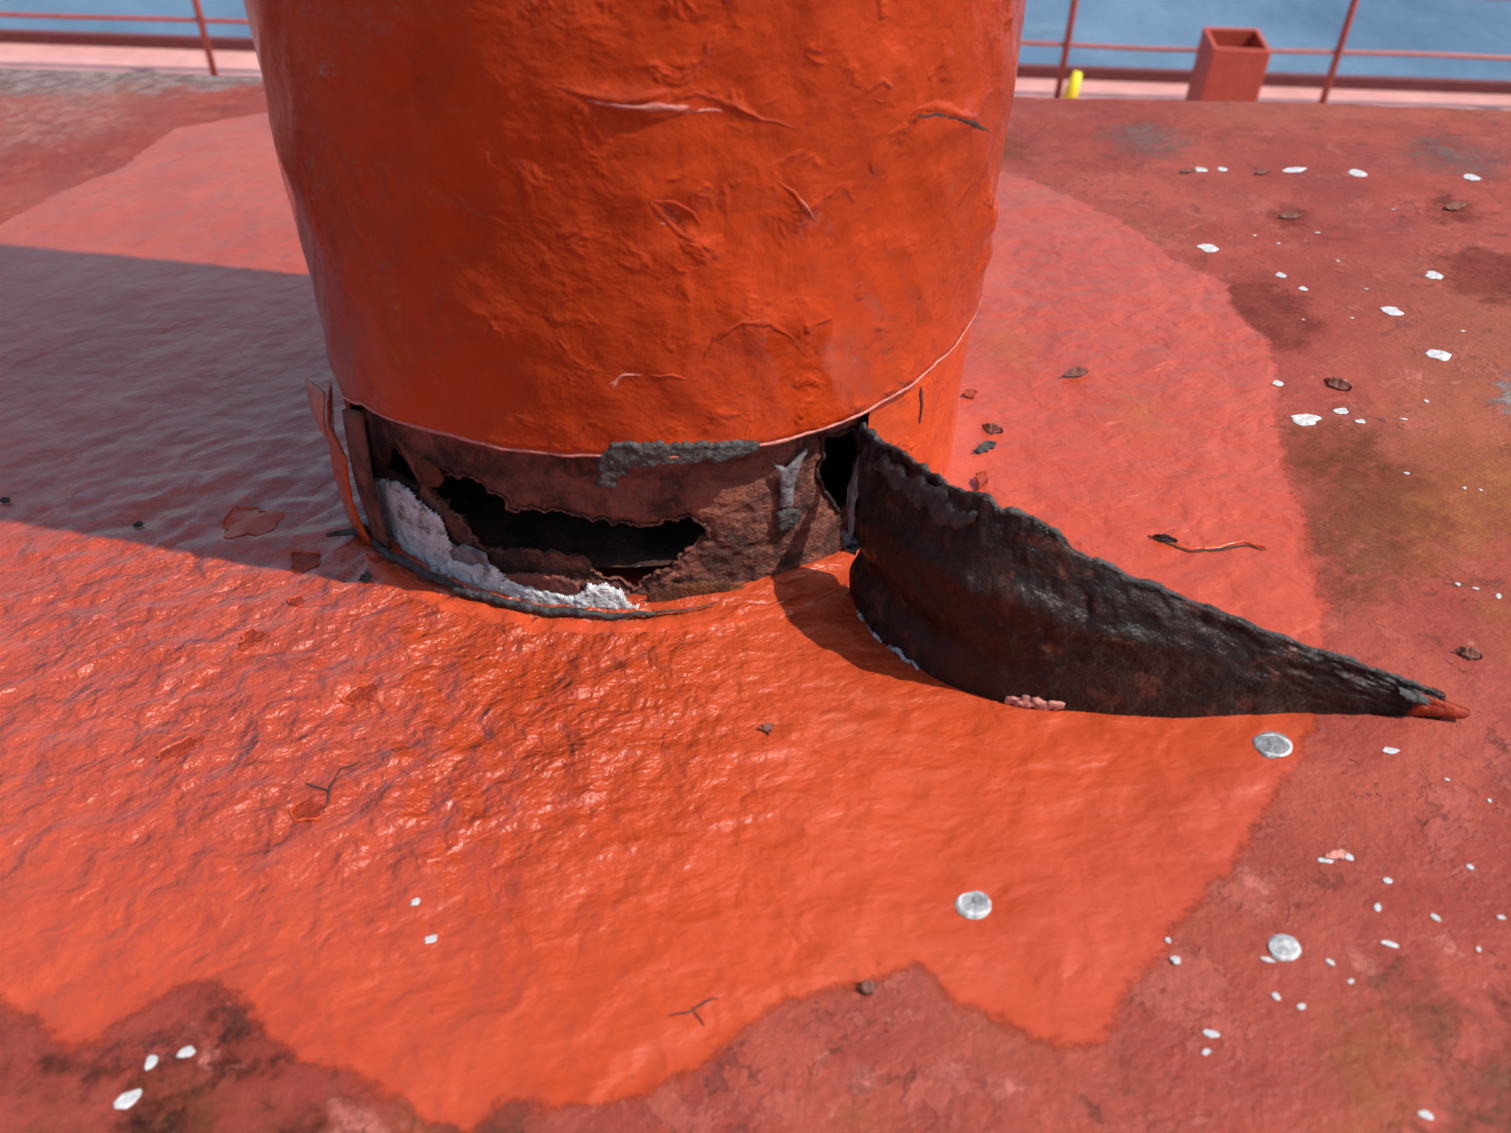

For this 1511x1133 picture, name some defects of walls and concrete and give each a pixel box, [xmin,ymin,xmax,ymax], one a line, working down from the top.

corrosion [414,456,446,488]
peeling [873,453,978,530]
peeling [974,423,1004,490]
peeling [1153,533,1178,543]
corrosion [326,526,745,620]
peeling [856,610,919,670]
peeling [1005,695,1065,711]
peeling [1397,687,1430,706]